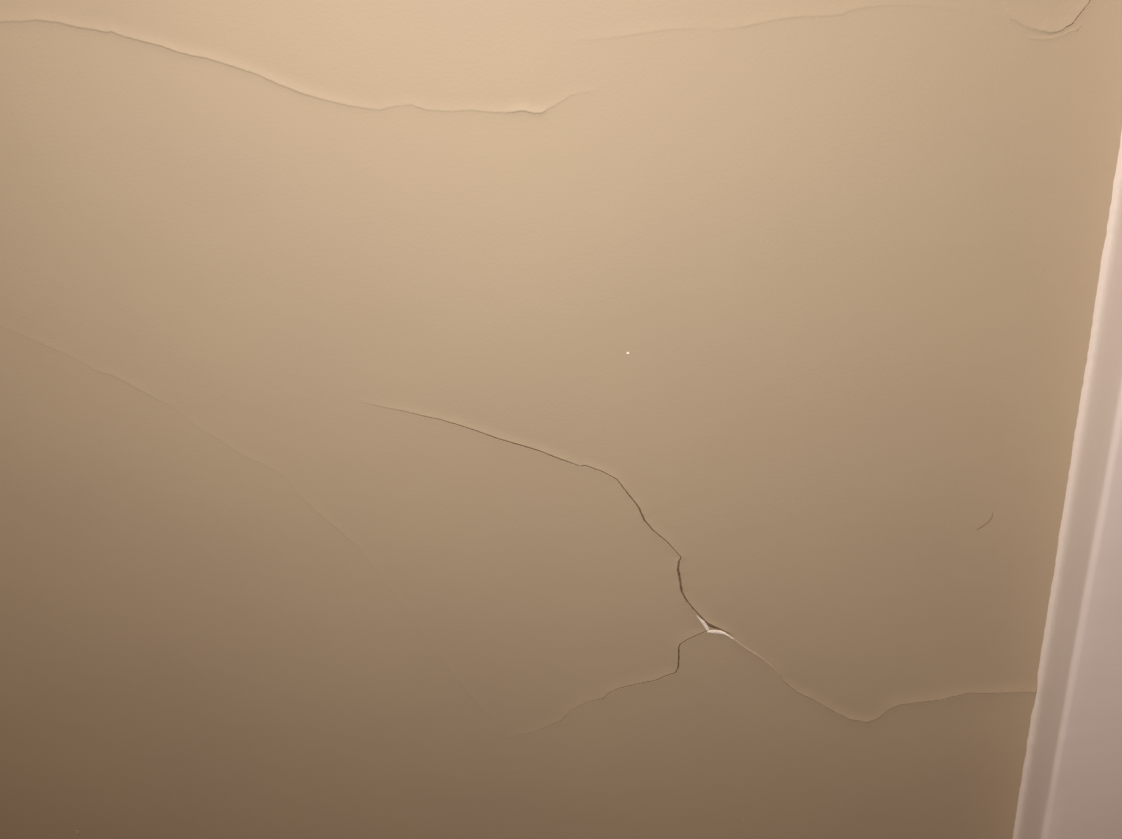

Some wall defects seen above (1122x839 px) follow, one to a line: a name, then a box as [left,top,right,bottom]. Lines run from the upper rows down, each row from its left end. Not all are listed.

crack [354,394,1038,749]